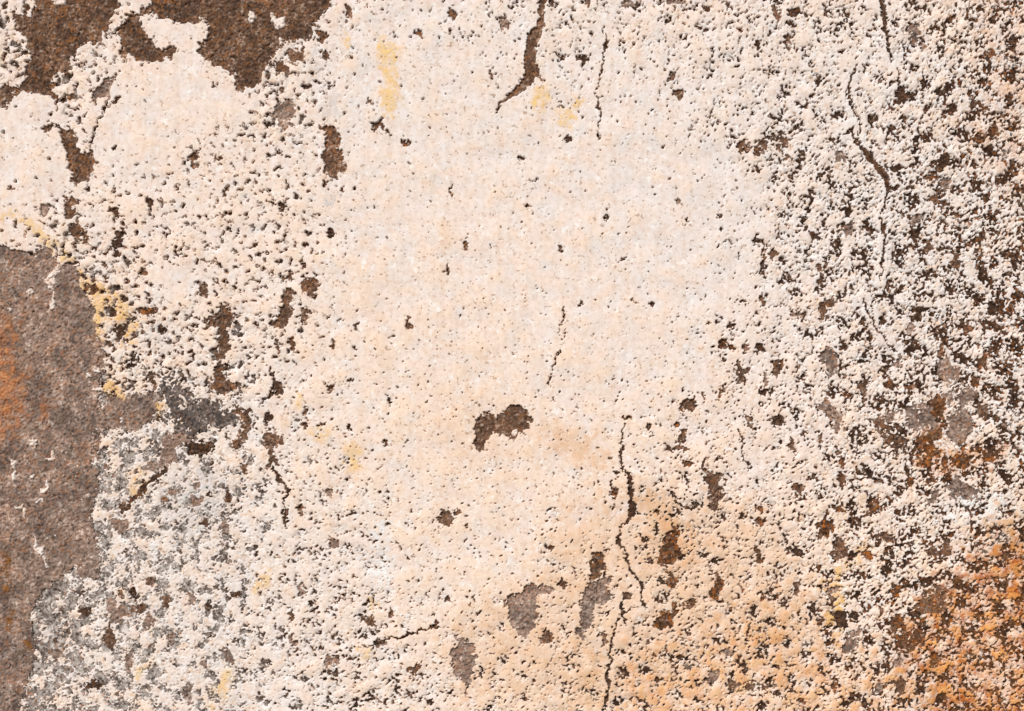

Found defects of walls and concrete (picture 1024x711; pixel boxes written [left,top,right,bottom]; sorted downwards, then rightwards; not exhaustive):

spalling [0,0,331,133]
crack [496,0,548,113]
crack [879,0,900,89]
spalling [187,148,202,171]
crack [843,64,900,352]
spalling [0,244,284,711]
spalling [472,405,534,453]
spalling [449,634,478,698]
spalling [504,577,568,645]
spalling [575,545,632,646]
crack [602,423,659,711]
rust [897,531,1024,711]